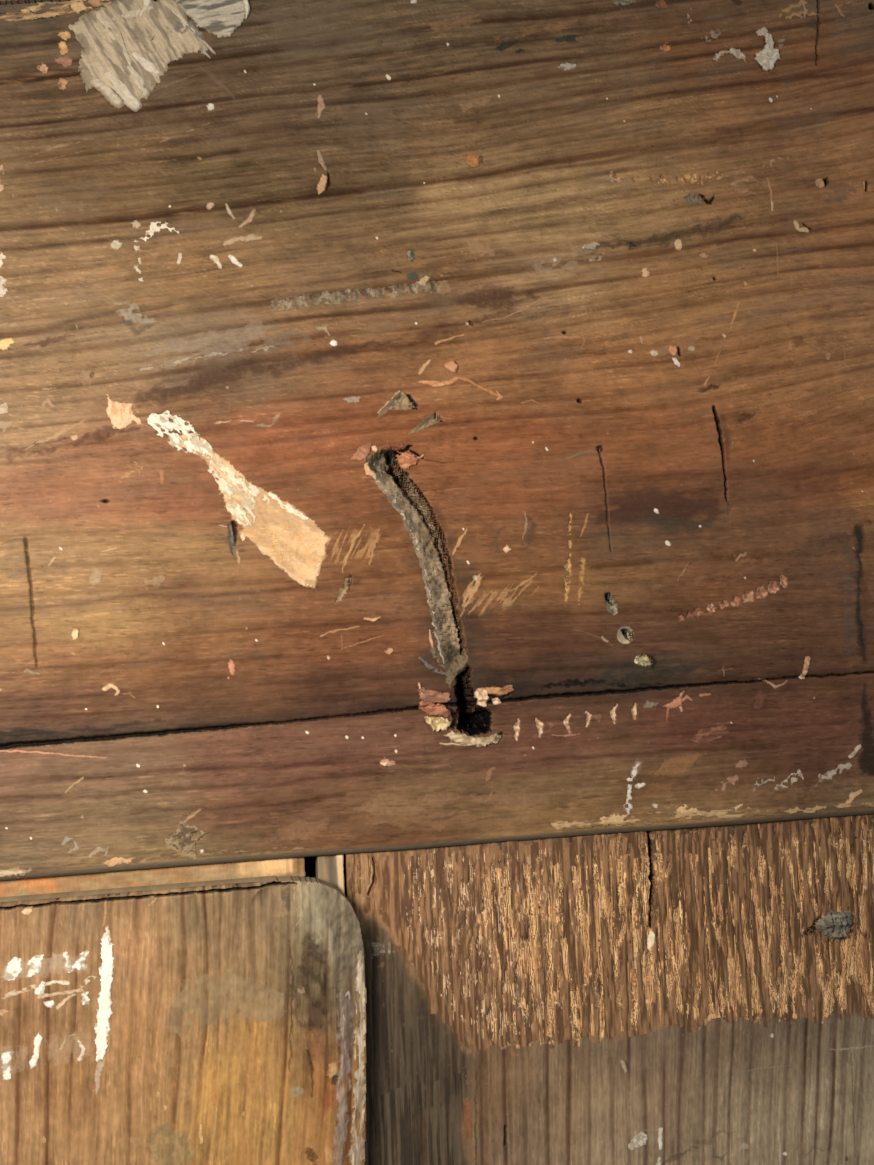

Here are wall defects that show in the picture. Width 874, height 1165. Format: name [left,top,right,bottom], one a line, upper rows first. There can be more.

crack [0,672,874,750]
crack [647,831,656,949]